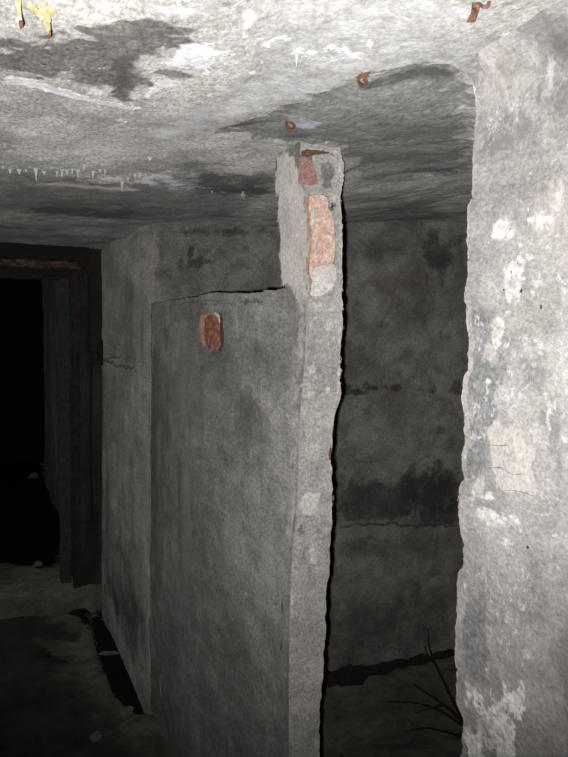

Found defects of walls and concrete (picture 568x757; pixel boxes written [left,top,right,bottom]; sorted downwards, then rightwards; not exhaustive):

water stain [0,19,236,123]
water stain [23,164,269,198]
water stain [321,162,334,188]
spalling [216,62,478,400]
spalling [199,312,224,351]
spalling [461,182,541,498]
spalling [455,592,500,689]